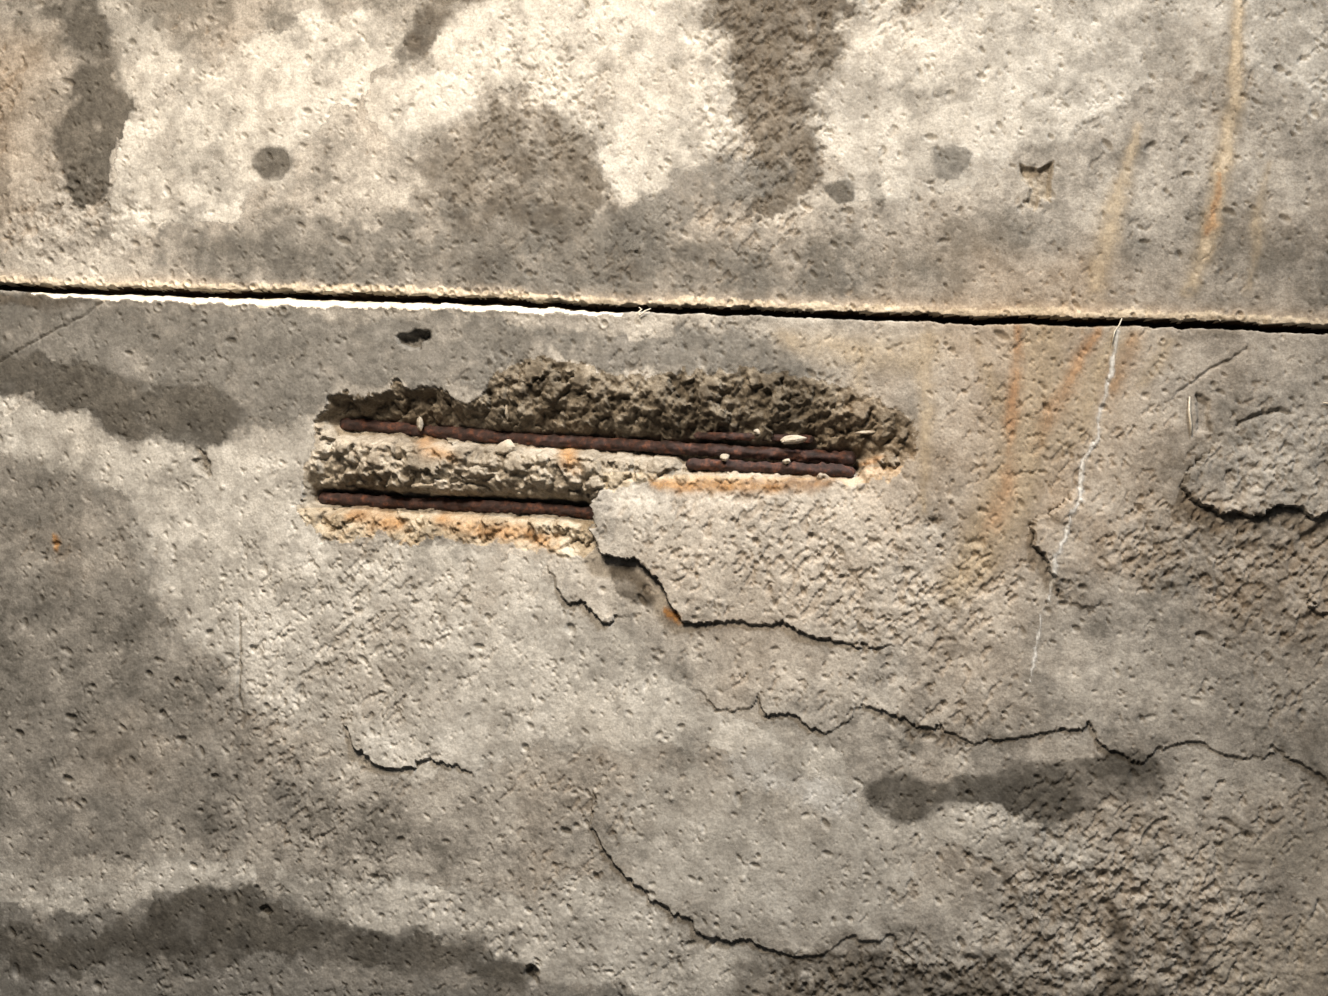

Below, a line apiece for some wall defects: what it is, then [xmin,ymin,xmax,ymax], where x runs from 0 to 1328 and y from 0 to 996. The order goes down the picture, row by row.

leakage [46,0,1328,299]
corrosion [1089,124,1140,291]
corrosion [1186,0,1244,286]
leakage [0,291,1163,996]
spalling [296,355,920,624]
crack [588,488,903,650]
crack [692,691,1328,785]
corrosion [949,325,1131,592]
crack [1028,330,1119,682]
crack [1179,407,1328,521]
leakage [1207,917,1328,996]
leakage [1213,829,1328,900]